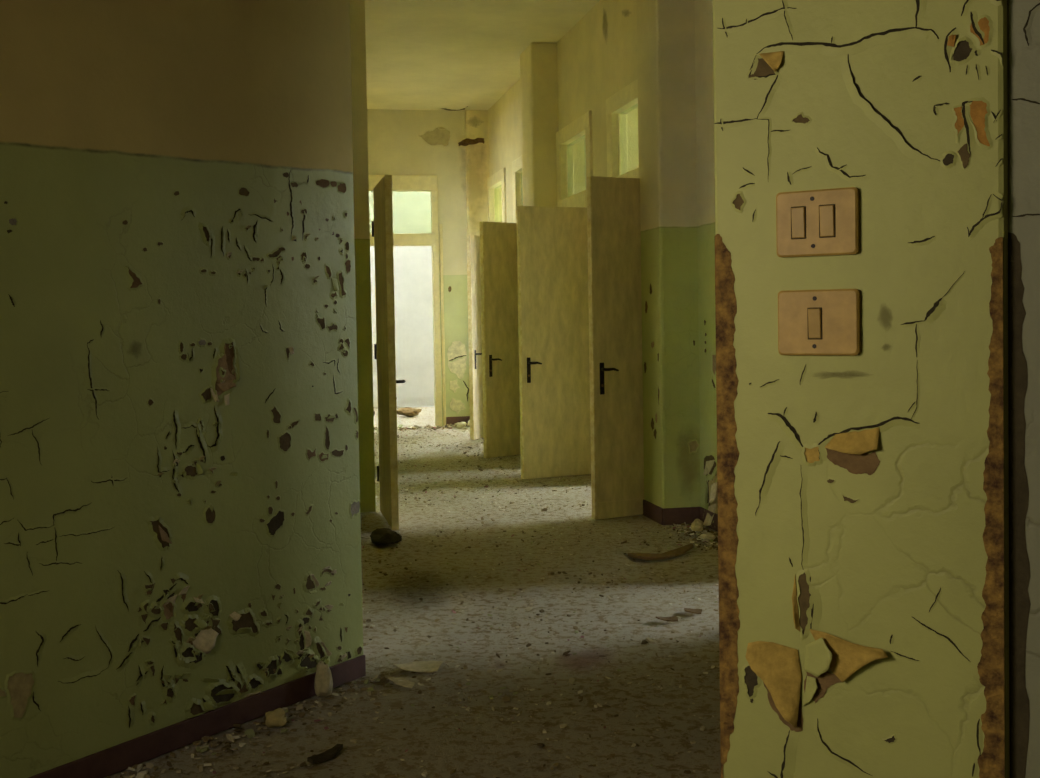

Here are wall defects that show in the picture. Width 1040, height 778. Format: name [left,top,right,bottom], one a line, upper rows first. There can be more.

crack [714,117,867,185]
crack [716,0,940,170]
spalling [933,97,993,170]
spalling [944,11,1002,72]
crack [963,98,1040,242]
peeling [226,211,352,358]
crack [900,271,966,420]
crack [755,441,810,570]
spalling [702,234,920,778]
spalling [972,232,1031,778]
peeling [138,566,363,719]
crack [767,718,873,778]